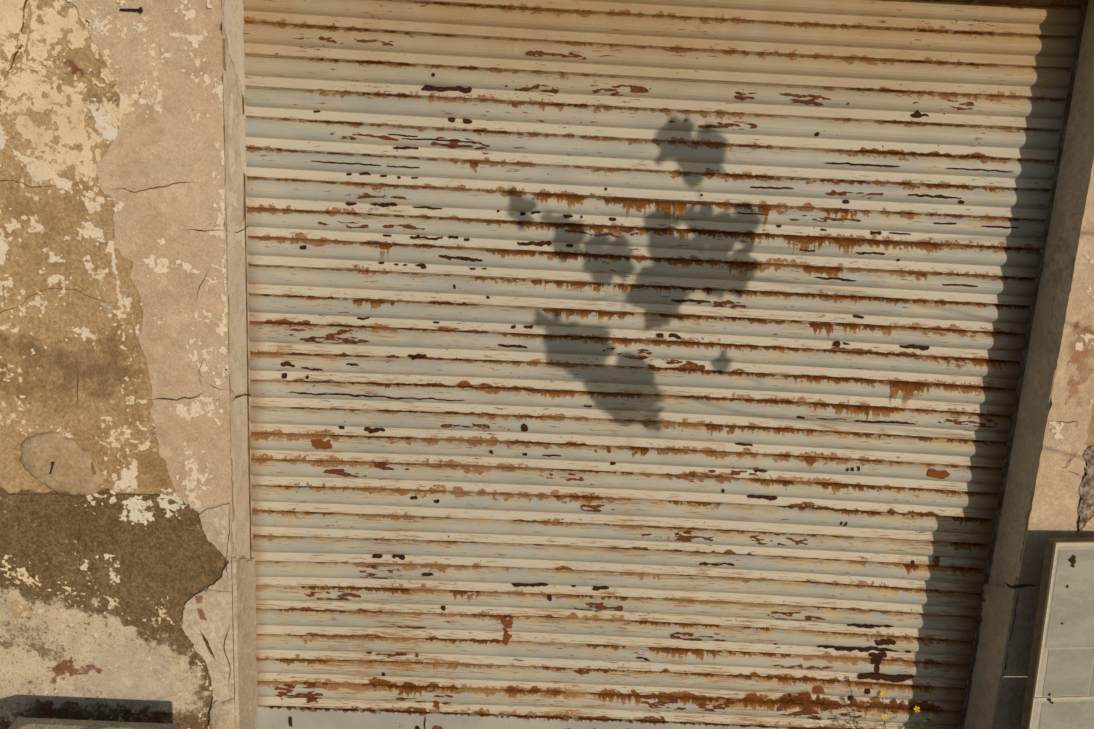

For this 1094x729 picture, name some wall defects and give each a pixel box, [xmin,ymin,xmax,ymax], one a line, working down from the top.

crack [5,0,28,77]
rust [505,83,649,108]
peeling [0,0,247,438]
crack [118,182,193,193]
rust [264,110,1028,454]
spalling [75,376,258,729]
rust [272,554,410,613]
rust [311,426,416,478]
rust [510,414,634,512]
rust [611,467,991,576]
rust [772,454,992,497]
rust [270,606,944,729]